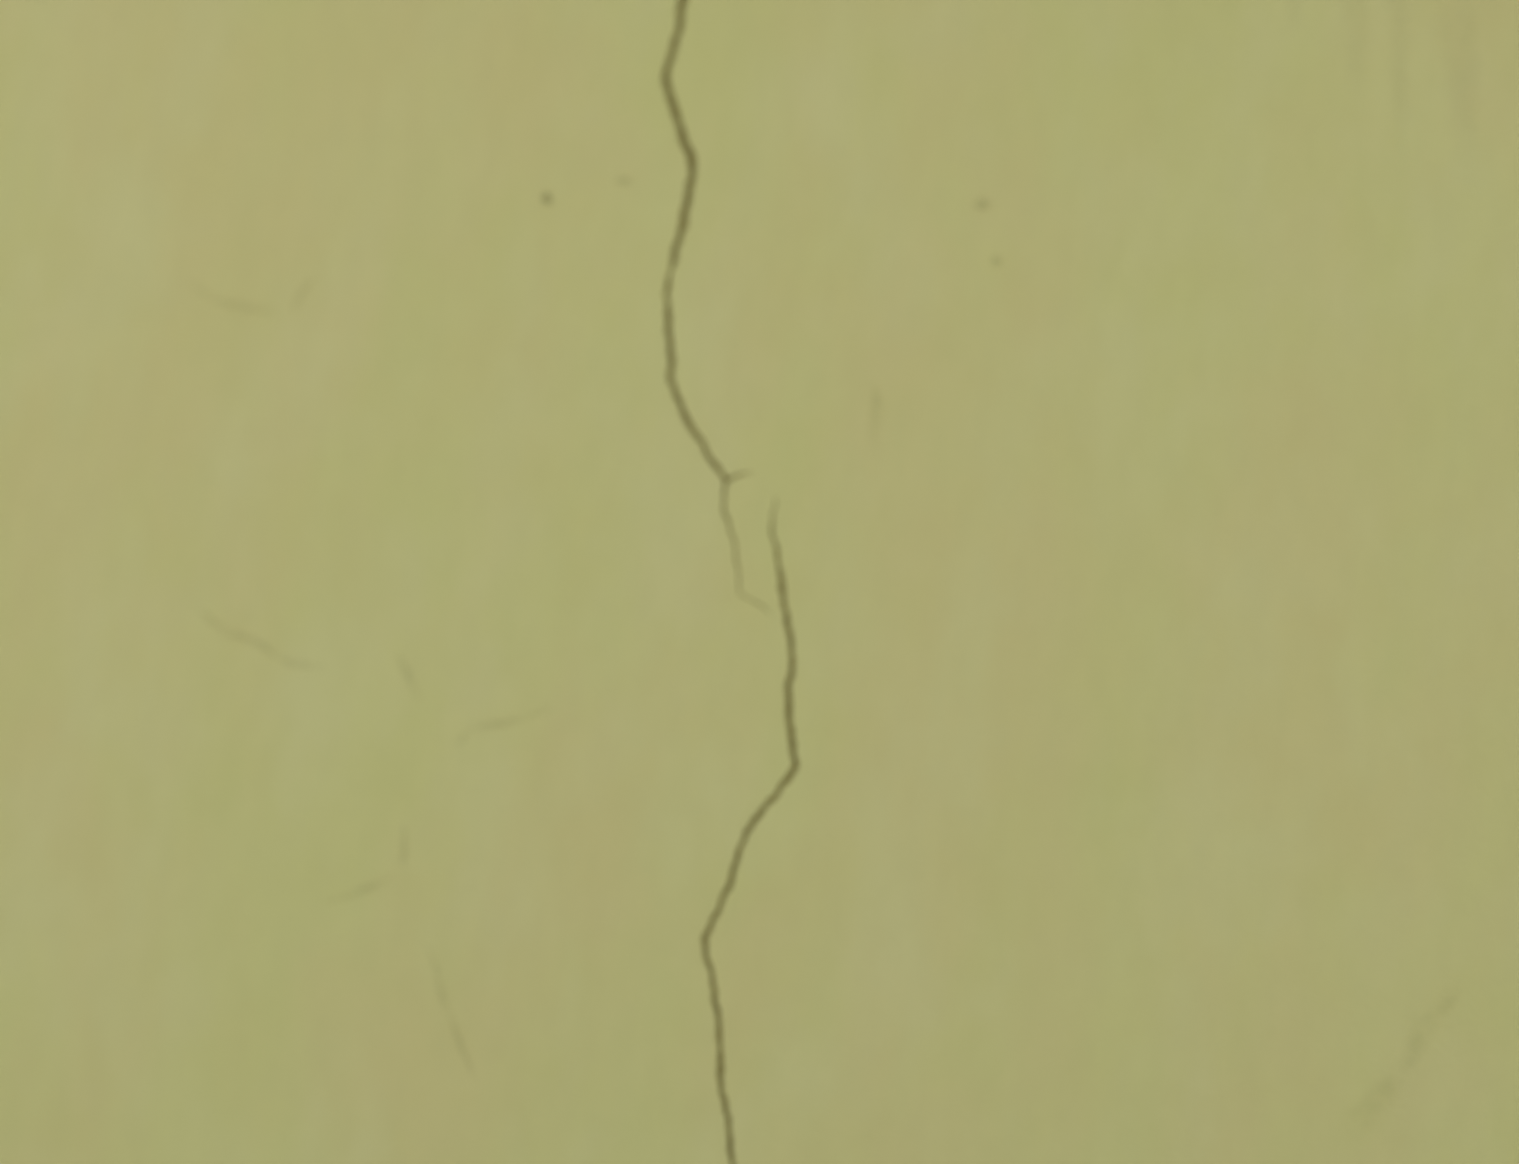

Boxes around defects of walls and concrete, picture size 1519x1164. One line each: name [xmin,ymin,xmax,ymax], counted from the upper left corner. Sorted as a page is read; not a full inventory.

crack [662,0,800,1164]